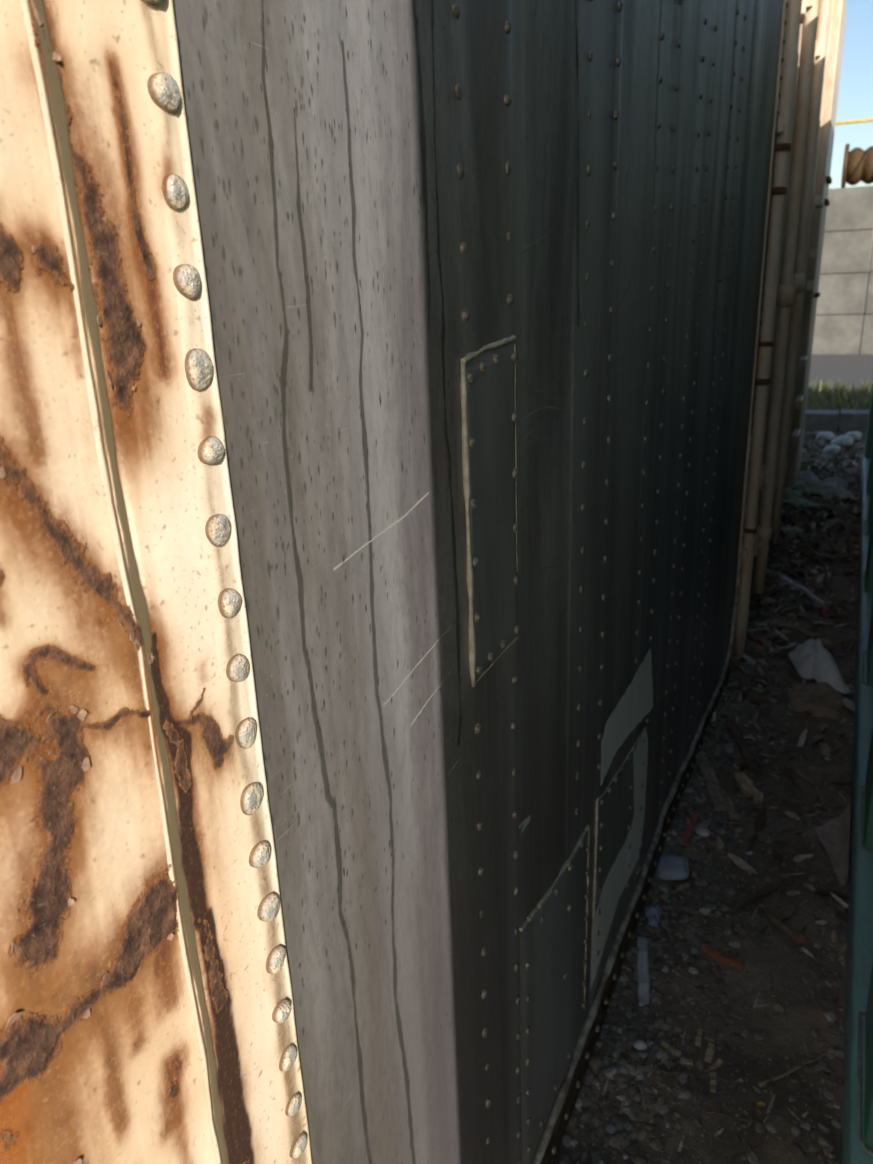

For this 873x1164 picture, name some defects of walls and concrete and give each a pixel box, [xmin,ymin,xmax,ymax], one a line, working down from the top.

corrosion [33,0,171,449]
corrosion [0,222,254,1164]
corrosion [252,813,262,844]
corrosion [260,866,269,900]
corrosion [278,1023,302,1164]